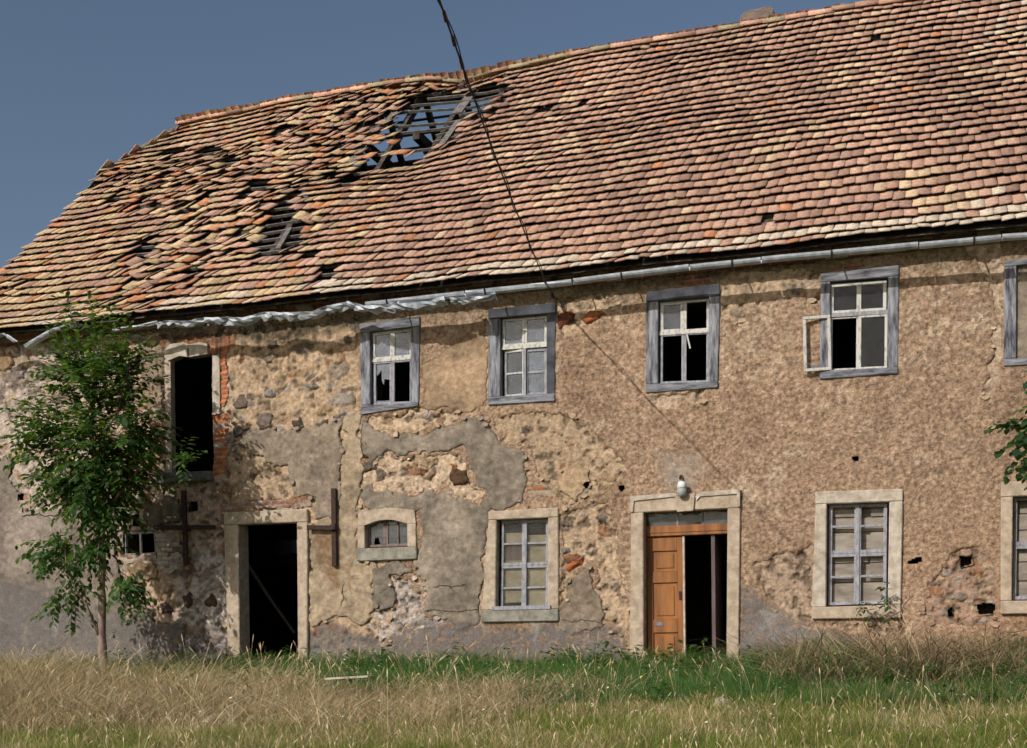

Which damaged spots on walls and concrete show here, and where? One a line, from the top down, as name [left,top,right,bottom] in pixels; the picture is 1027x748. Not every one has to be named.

spalling [556,294,621,336]
spalling [0,314,484,665]
spalling [478,412,630,638]
spalling [918,547,999,627]